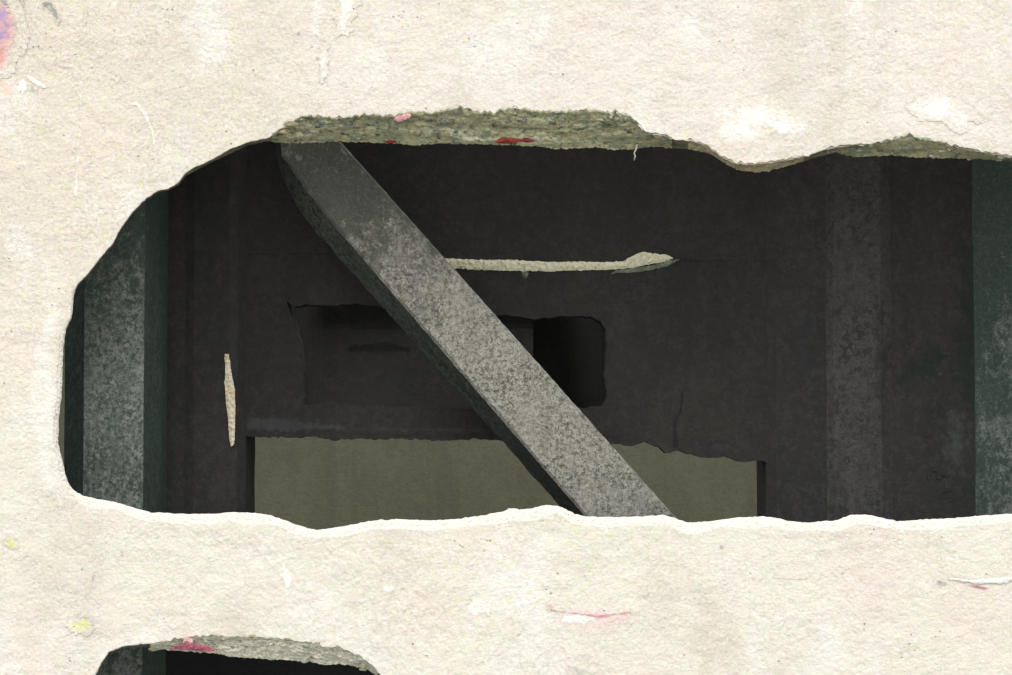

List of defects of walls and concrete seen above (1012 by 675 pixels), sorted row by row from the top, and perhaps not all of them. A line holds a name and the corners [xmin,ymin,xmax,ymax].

spalling [272,99,672,150]
spalling [688,138,804,173]
spalling [827,133,1012,162]
spalling [445,252,680,279]
spalling [224,354,236,446]
spalling [148,634,377,675]